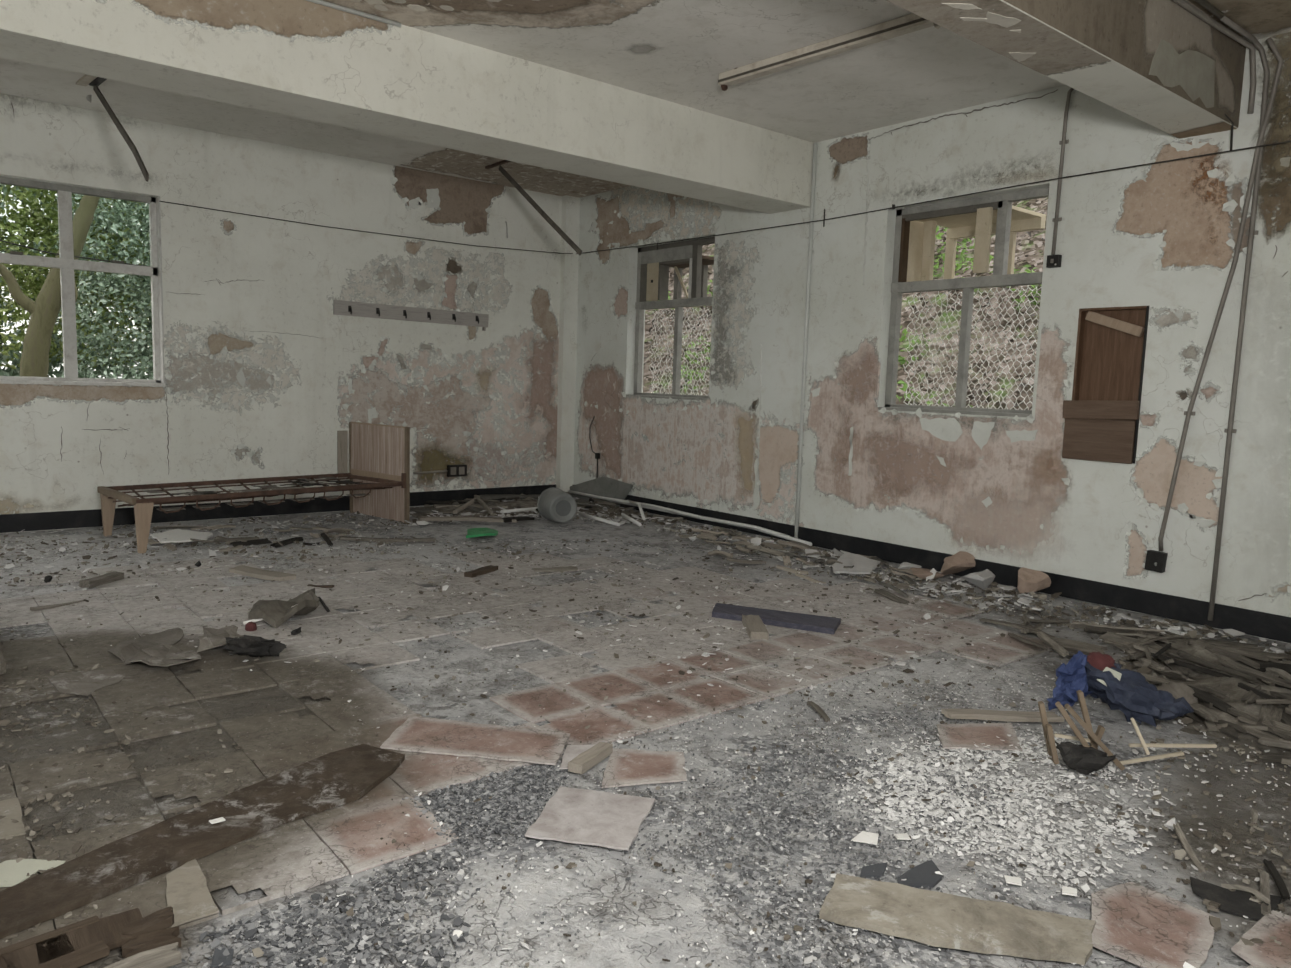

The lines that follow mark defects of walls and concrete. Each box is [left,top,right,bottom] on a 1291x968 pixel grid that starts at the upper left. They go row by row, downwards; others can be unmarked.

peeling [133,0,659,42]
peeling [886,0,1111,76]
damp [1004,0,1291,239]
peeling [390,165,505,236]
peeling [1113,134,1251,271]
peeling [0,321,301,416]
peeling [373,240,479,312]
peeling [337,285,559,492]
damp [710,249,740,382]
peeling [577,186,1071,553]
peeling [1130,412,1229,531]
peeling [1124,522,1148,578]